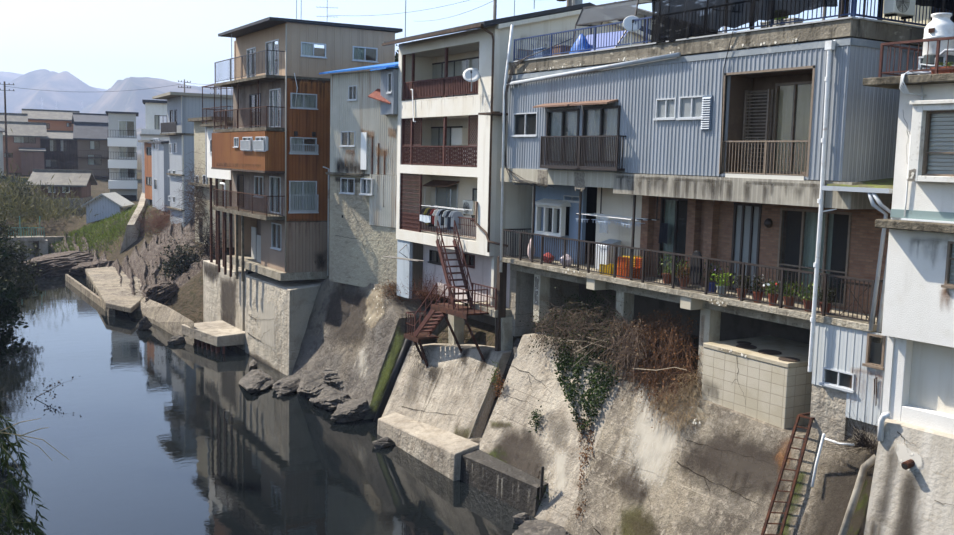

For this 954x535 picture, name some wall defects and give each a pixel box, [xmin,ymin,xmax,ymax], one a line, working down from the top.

damp [325,289,367,341]
damp [684,436,783,508]